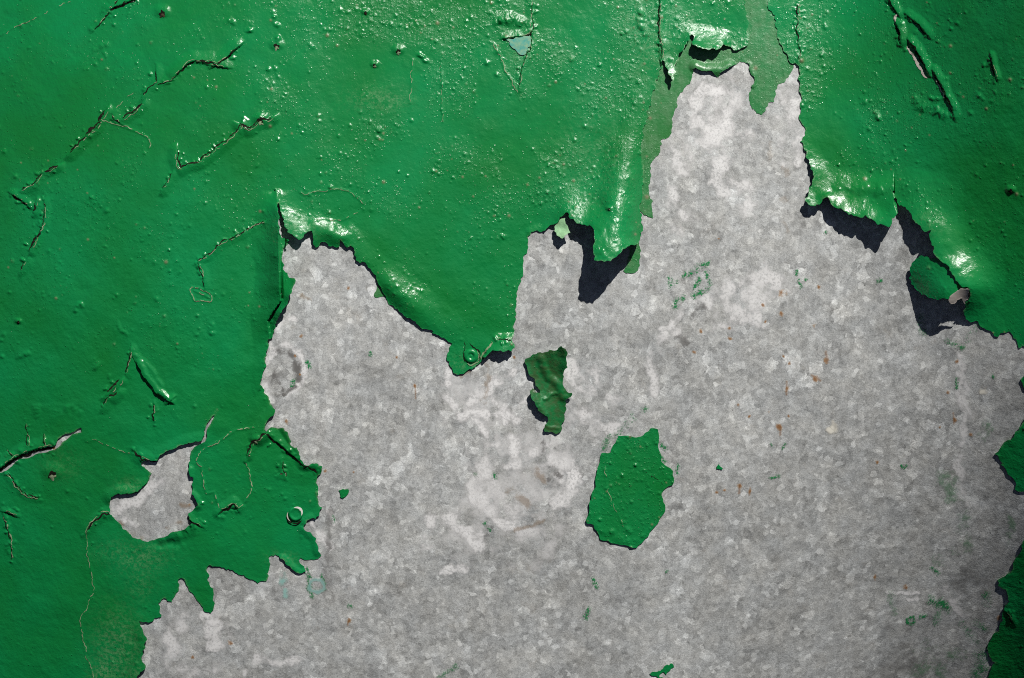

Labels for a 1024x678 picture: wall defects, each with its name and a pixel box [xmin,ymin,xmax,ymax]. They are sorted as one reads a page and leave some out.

crack [13,49,236,269]
crack [163,117,271,187]
peeling [639,0,795,218]
crack [889,0,953,113]
crack [197,221,264,286]
peeling [132,62,1024,678]
crack [0,424,54,559]
peeling [109,415,215,542]